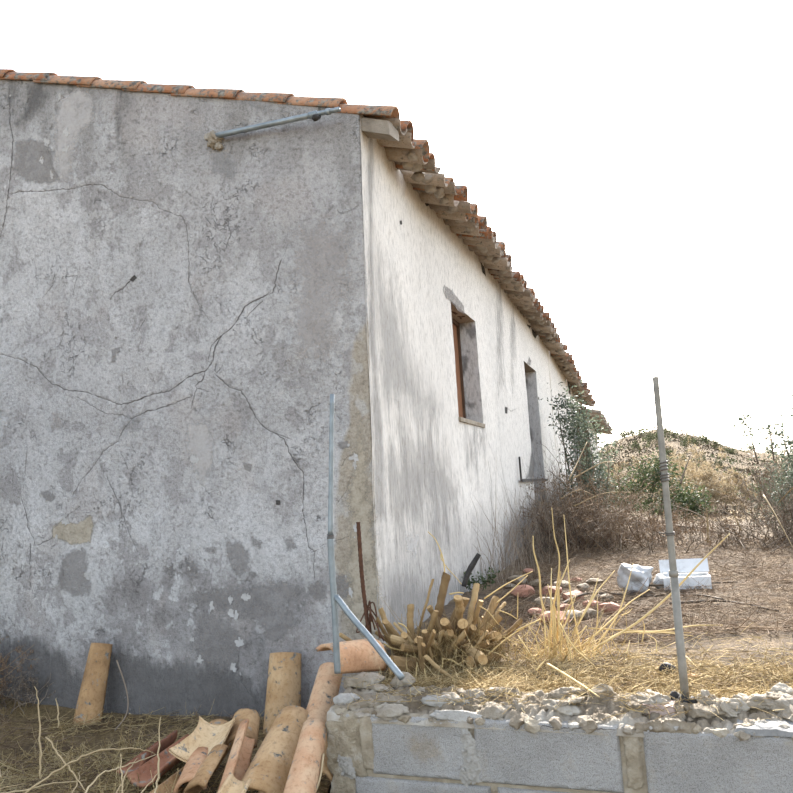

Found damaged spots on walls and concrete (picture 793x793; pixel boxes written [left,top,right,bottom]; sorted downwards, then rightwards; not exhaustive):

crack [0,89,205,314]
crack [0,244,355,580]
peeling [52,516,93,595]
peeling [336,422,384,641]